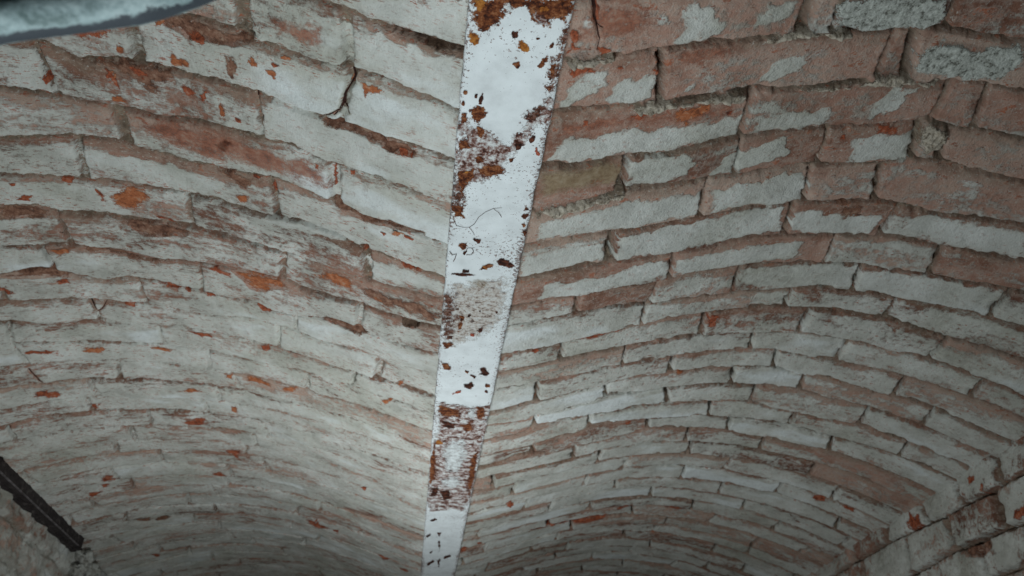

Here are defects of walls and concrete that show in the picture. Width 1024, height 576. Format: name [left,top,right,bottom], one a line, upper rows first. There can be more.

peeling [566,30,580,53]
peeling [570,67,596,78]
crack [326,66,357,115]
peeling [552,104,736,147]
peeling [876,122,898,136]
peeling [455,97,554,189]
spalling [95,185,187,238]
spalling [835,198,863,219]
spalling [205,265,283,291]
peeling [427,402,490,512]
spalling [907,511,929,531]